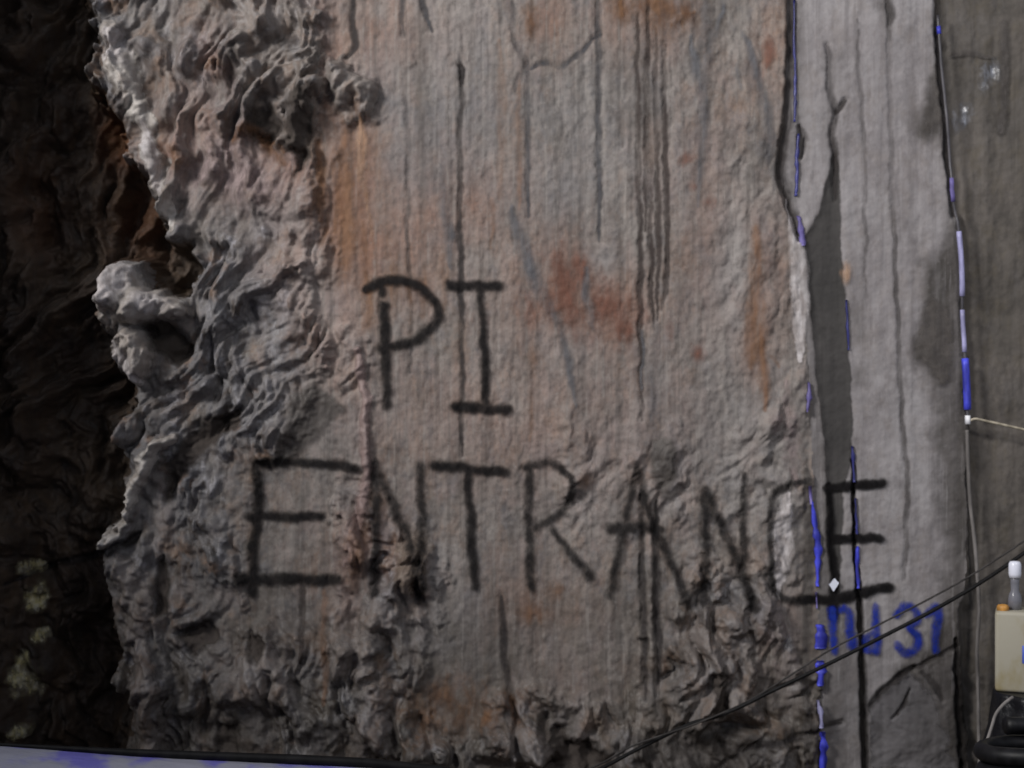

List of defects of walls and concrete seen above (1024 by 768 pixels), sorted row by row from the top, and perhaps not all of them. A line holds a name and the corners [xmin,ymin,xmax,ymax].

crack [776,0,805,240]